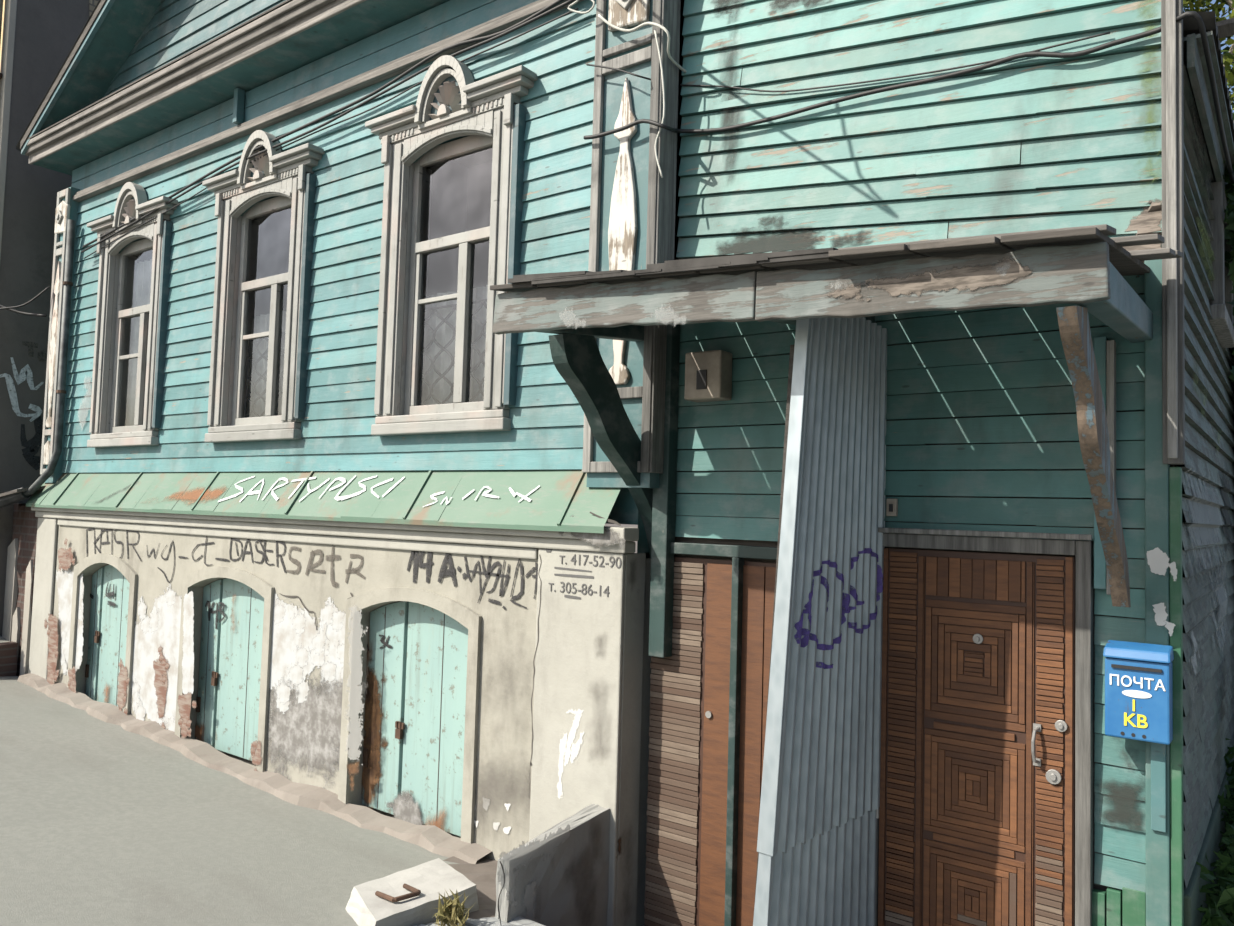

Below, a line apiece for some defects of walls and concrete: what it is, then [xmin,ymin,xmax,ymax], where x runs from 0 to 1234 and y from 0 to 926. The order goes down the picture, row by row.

leakage [715,0,730,13]
leakage [771,0,828,16]
leakage [717,217,866,256]
peeling [827,258,1032,301]
peeling [1147,547,1177,581]
peeling [44,538,84,693]
peeling [1152,603,1176,636]
peeling [117,584,197,738]
flaking render [250,593,368,780]
corrosion [361,643,388,805]